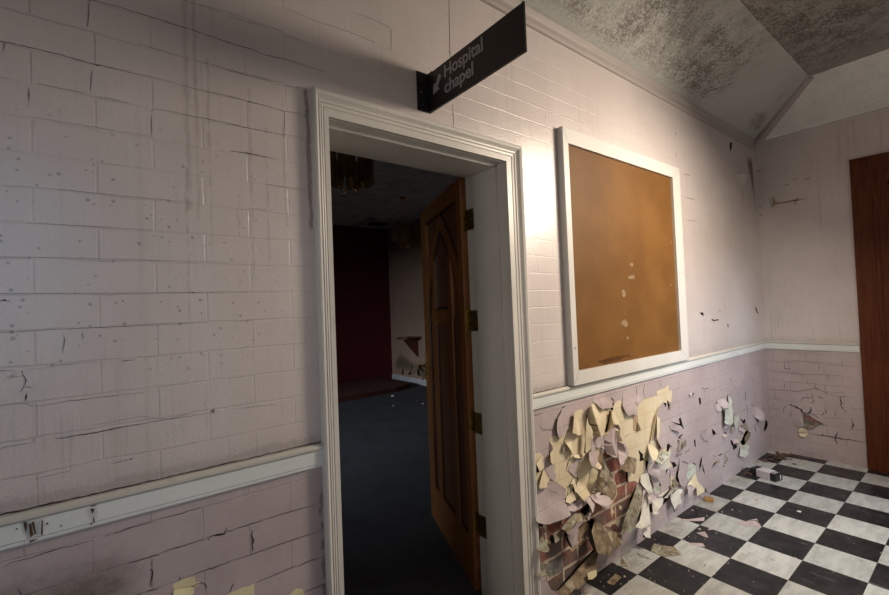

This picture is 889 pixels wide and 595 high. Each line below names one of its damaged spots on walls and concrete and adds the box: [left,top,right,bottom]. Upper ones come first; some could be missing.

peeling [535,385,769,595]